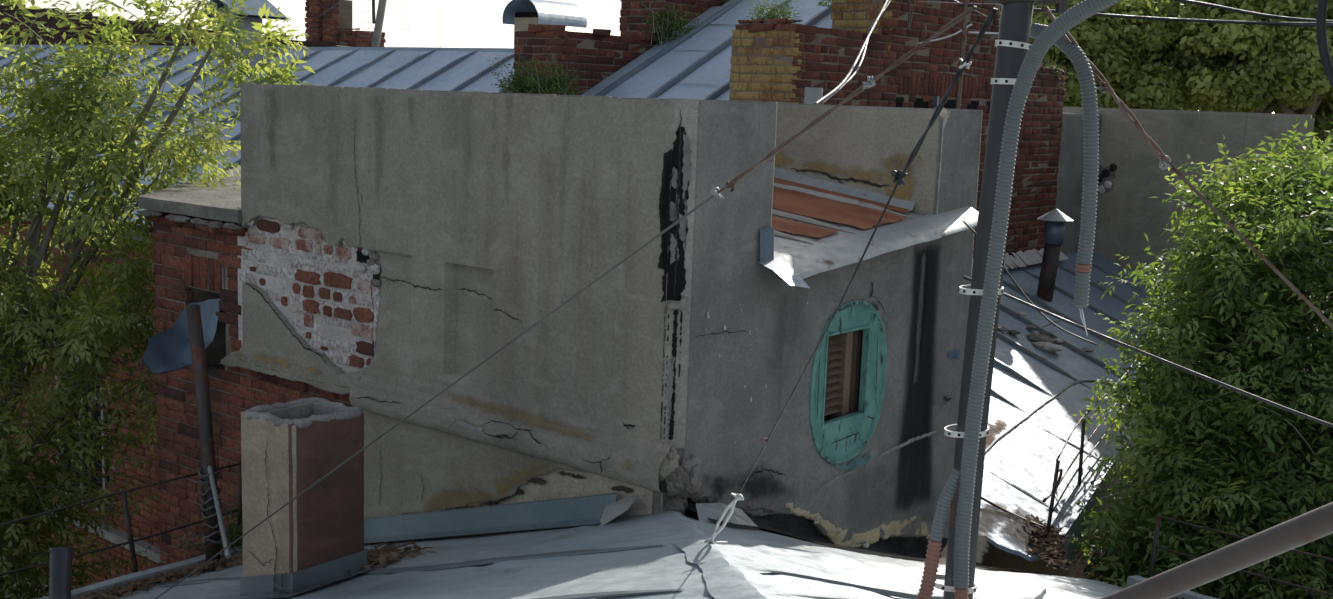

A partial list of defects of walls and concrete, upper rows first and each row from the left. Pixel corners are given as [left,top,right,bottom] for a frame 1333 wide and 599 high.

crack [790,168,888,187]
corrosion [771,177,908,238]
spalling [143,207,381,373]
crack [376,276,522,323]
peeling [451,110,713,516]
crack [480,420,542,444]
spalling [785,502,931,551]